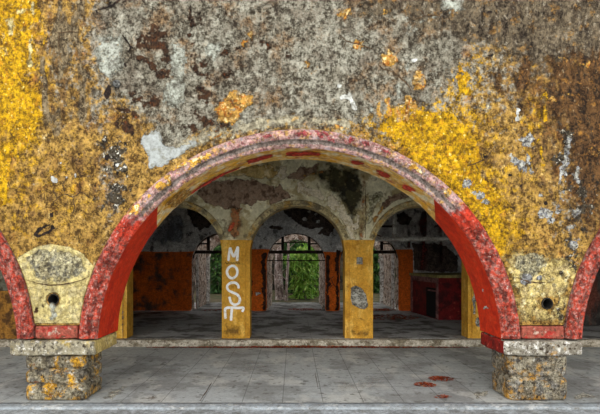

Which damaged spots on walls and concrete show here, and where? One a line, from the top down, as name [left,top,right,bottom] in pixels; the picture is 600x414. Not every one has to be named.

peeling [91,0,507,256]
peeling [537,92,557,129]
peeling [510,133,545,174]
leakage [287,162,363,219]
peeling [538,193,555,224]
peeling [412,243,458,273]
peeling [351,286,368,309]